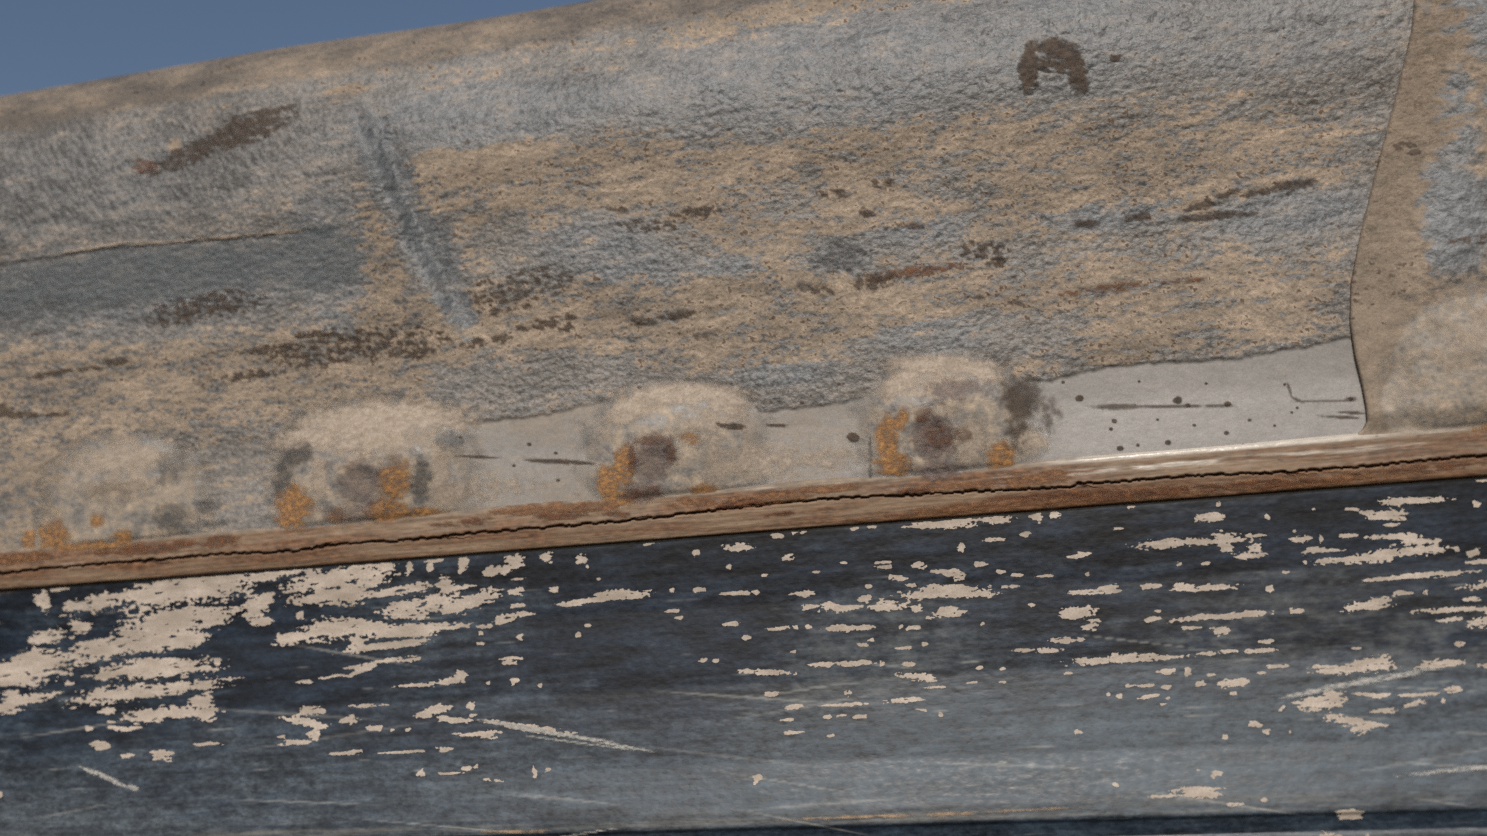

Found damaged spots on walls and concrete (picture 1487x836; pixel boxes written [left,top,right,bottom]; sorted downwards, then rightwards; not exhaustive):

peeling [0,551,553,762]
peeling [549,553,683,620]
peeling [693,574,768,595]
peeling [722,621,751,641]
peeling [721,542,753,570]
peeling [737,512,1062,738]
peeling [966,496,1487,736]
peeling [277,669,577,782]
peeling [1148,769,1268,807]